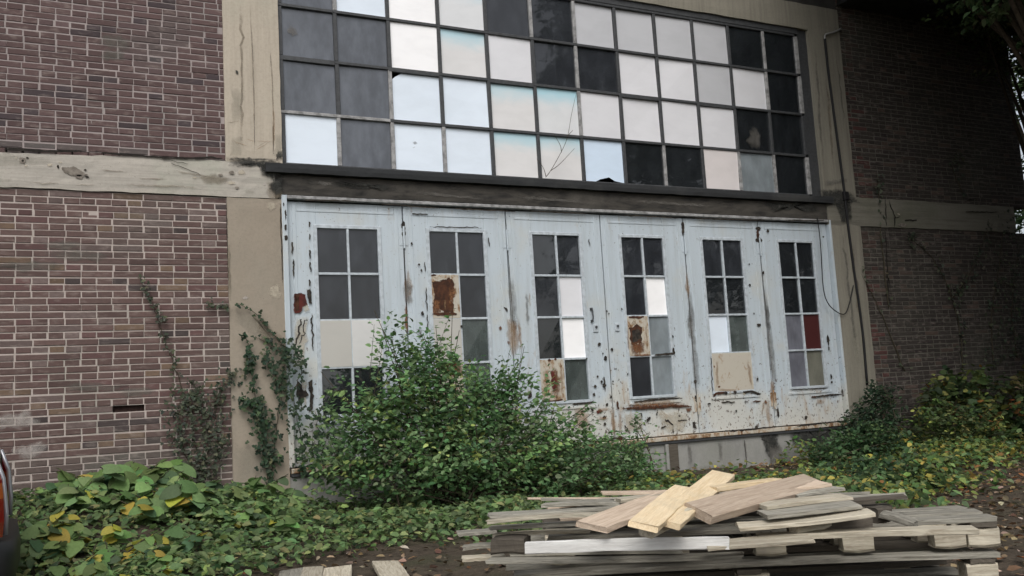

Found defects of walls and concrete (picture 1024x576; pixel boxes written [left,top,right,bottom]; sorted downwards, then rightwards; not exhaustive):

spalling [47,162,89,179]
damp [232,151,283,197]
corrosion [431,274,457,316]
corrosion [548,254,779,439]
peeling [616,408,697,440]